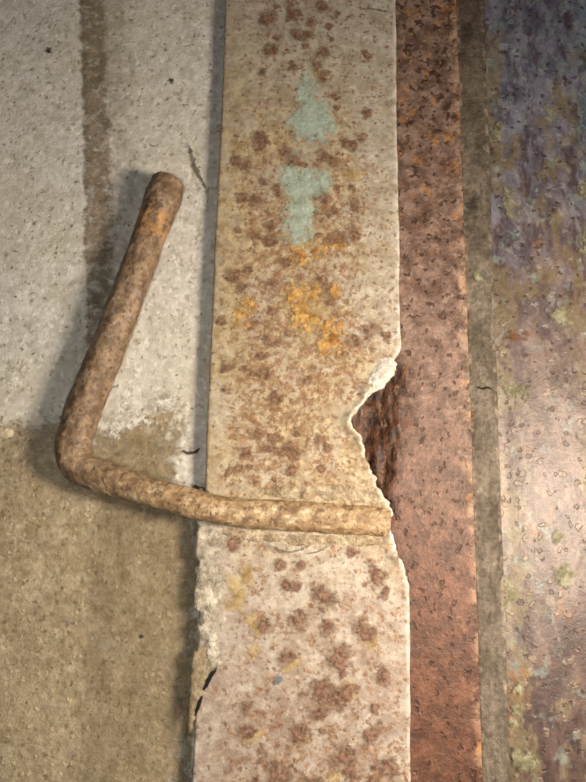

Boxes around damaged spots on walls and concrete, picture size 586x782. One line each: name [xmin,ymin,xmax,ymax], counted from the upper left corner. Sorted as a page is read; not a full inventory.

damp [0,416,202,782]
damp [92,397,185,482]
rust [216,0,483,782]
peeling [367,357,397,398]